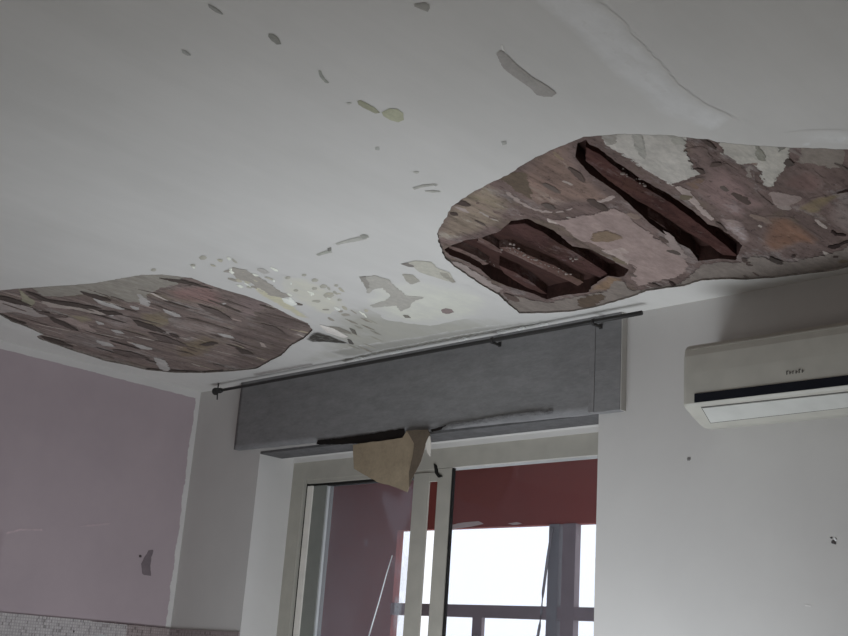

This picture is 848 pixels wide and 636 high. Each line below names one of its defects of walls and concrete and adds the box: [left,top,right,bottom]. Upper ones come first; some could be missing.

spalling [347,100,404,122]
spalling [497,45,556,97]
peeling [0,256,423,376]
spalling [340,224,848,363]